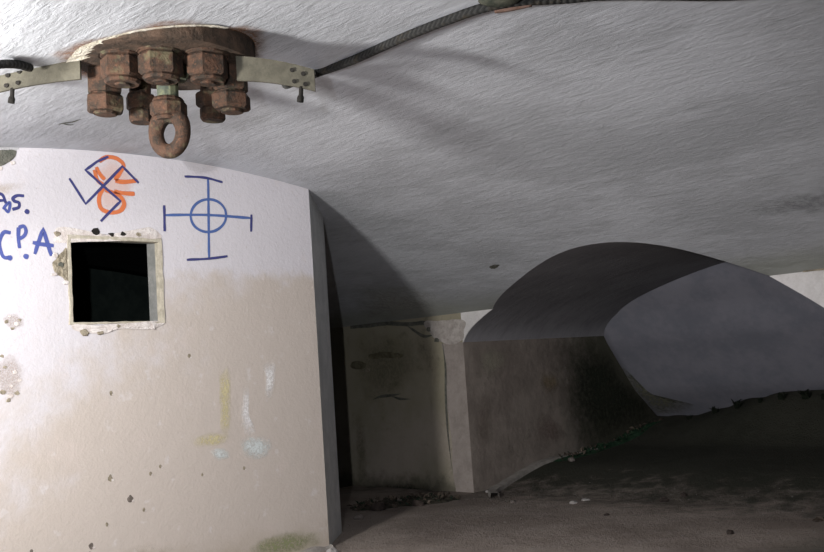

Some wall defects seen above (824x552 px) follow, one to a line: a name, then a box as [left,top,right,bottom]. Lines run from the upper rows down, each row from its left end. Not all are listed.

spalling [0,147,19,170]
spalling [51,227,162,285]
spalling [71,321,164,336]
peeling [0,354,22,402]